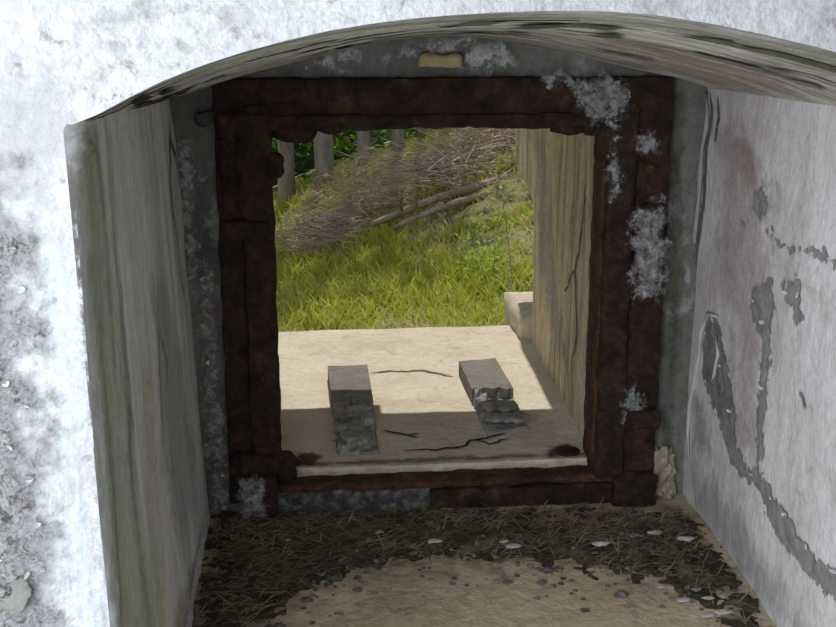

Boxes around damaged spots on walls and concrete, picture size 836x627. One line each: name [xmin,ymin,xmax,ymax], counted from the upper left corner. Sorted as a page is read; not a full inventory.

damp [465,45,516,68]
spalling [752,186,767,219]
damp [627,207,672,300]
crack [759,214,836,271]
rust [296,444,570,466]
crack [383,430,508,451]